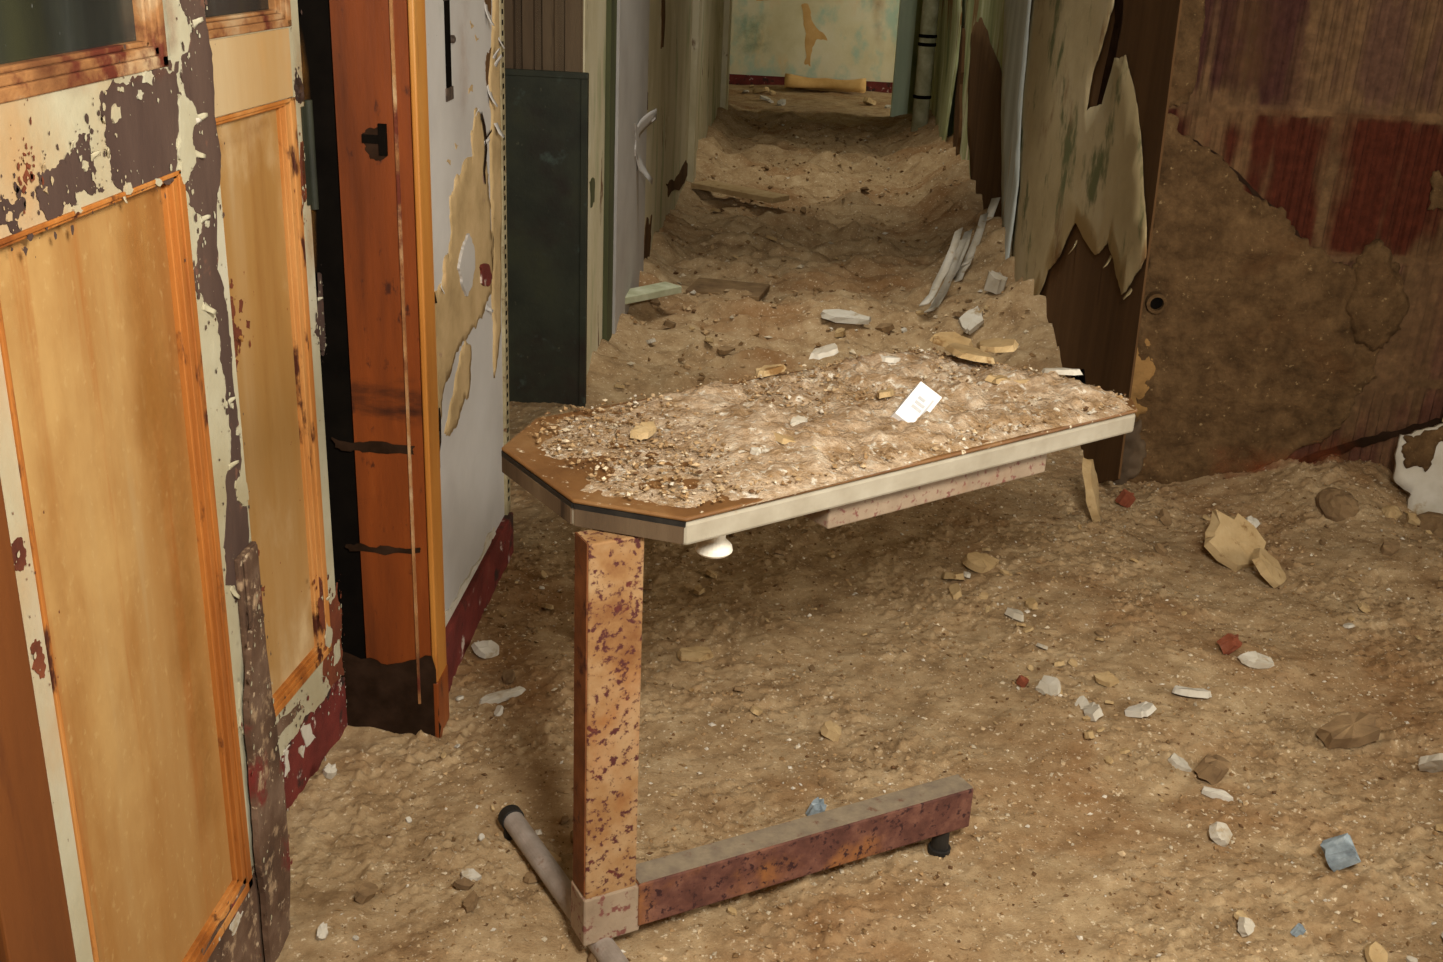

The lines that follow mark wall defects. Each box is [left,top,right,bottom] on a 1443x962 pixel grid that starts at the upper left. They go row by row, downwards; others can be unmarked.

spalling [801,3,828,66]
peeling [294,132,309,231]
spalling [435,0,505,436]
peeling [934,0,1205,485]
peeling [0,0,305,962]
peeling [313,575,344,692]
spalling [322,756,337,779]